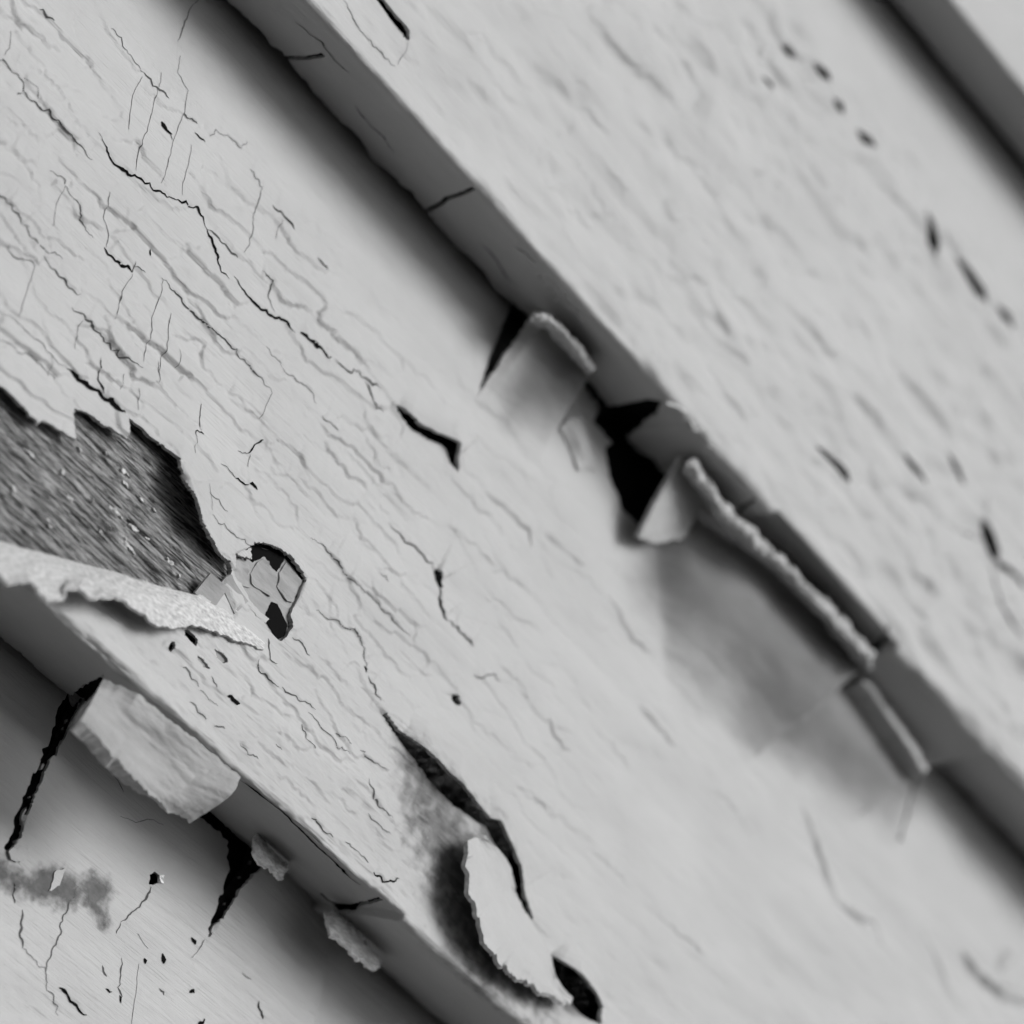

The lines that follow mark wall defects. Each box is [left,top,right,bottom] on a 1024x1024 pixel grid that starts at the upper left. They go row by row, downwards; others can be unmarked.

crack [0,0,457,490]
crack [427,187,473,211]
peeling [529,311,597,375]
peeling [560,417,596,471]
peeling [0,388,302,651]
crack [311,538,410,636]
crack [390,524,474,648]
crack [319,611,381,700]
crack [183,667,281,758]
crack [4,677,103,850]
crack [199,811,249,900]
peeling [413,778,573,1006]